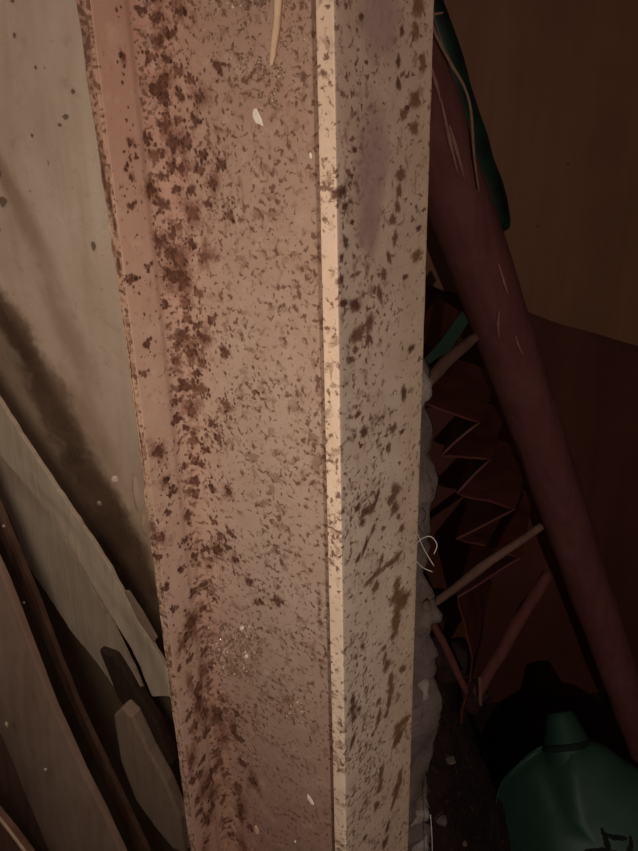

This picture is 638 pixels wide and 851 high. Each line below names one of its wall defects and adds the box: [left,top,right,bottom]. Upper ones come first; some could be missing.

rust [401,92,421,134]
rust [101,165,116,231]
rust [331,187,348,210]
rust [377,170,405,301]
rust [340,299,360,312]
rust [347,316,373,364]
rust [111,0,257,851]
rust [354,484,404,562]
rust [365,552,402,593]
rust [376,578,411,726]
rust [393,715,409,749]
rust [382,770,402,849]